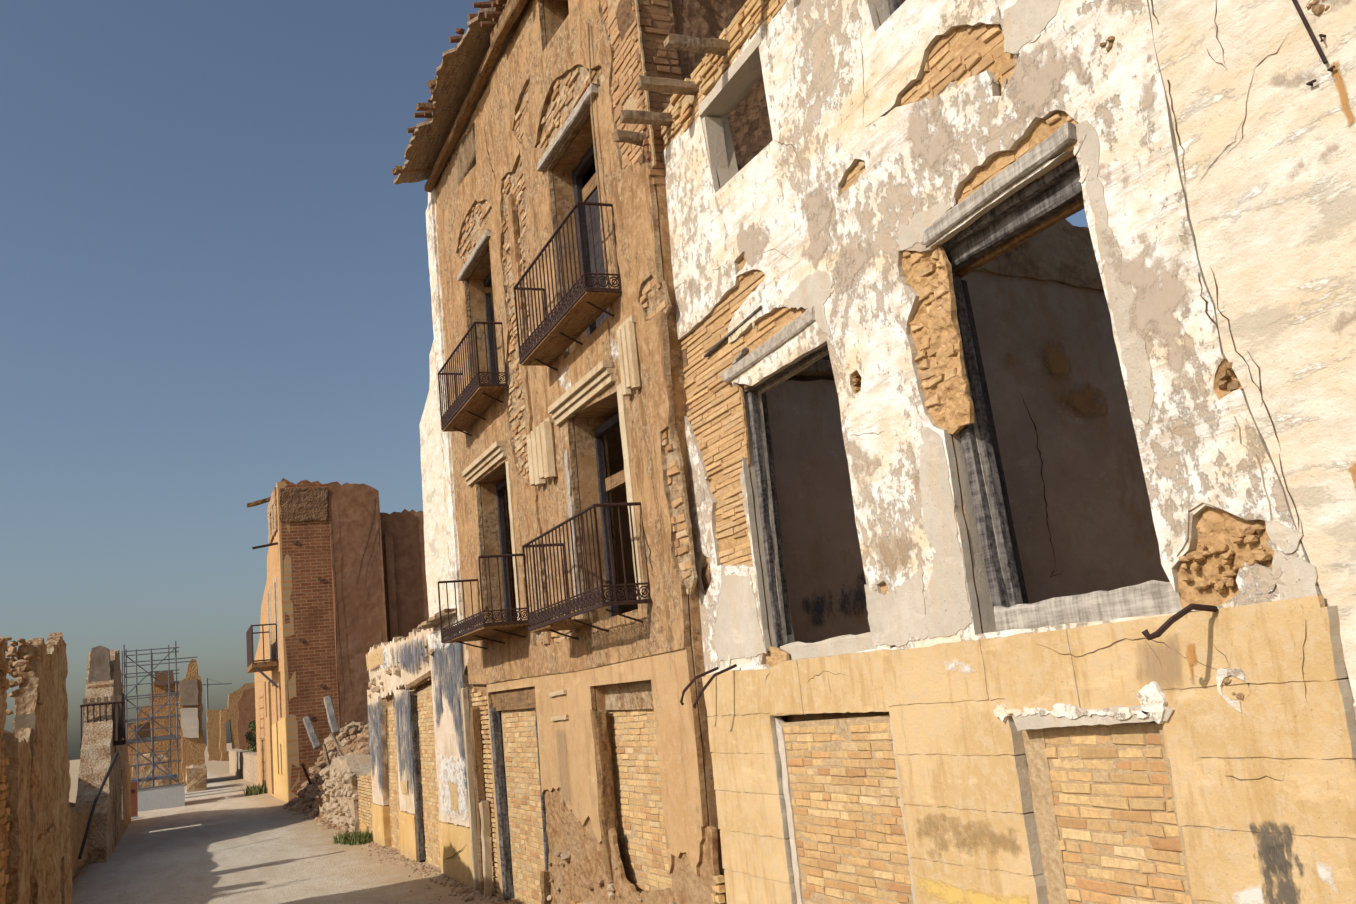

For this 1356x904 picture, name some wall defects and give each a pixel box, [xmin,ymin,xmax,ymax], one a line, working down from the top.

crack [1167,8,1285,211]
rust [1332,62,1354,125]
flaking render [804,0,1196,647]
flaking render [662,159,873,667]
spalling [1213,358,1247,400]
crack [1198,267,1303,543]
flaking render [1178,506,1319,612]
peeling [366,629,468,819]
crack [1036,638,1231,670]
spalling [1222,677,1249,700]
crack [1301,625,1309,705]